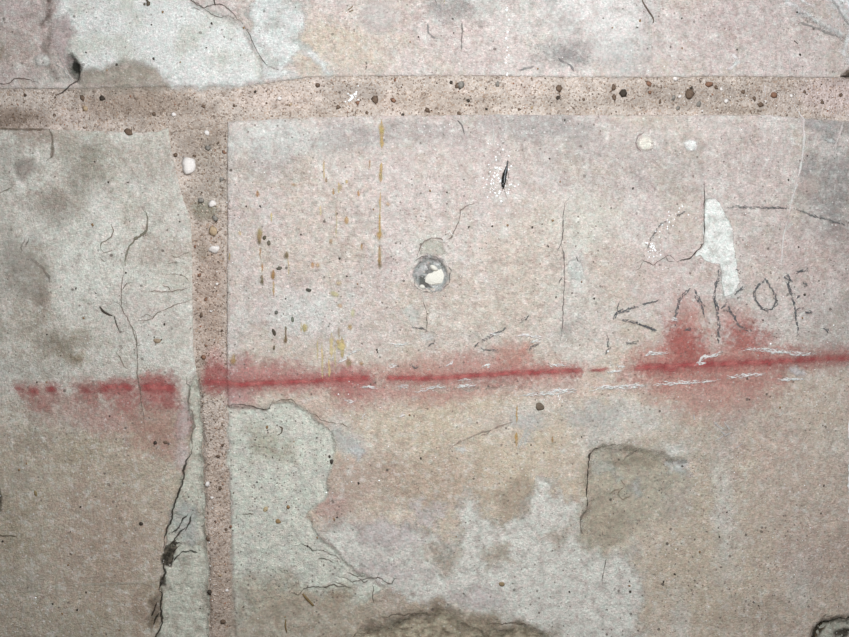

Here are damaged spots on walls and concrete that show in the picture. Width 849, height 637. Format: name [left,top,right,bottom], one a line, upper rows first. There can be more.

peeling [53,0,333,96]
crack [100,213,192,424]
peeling [678,184,741,302]
crack [151,381,197,637]
peeling [226,399,682,637]
spalling [811,617,849,637]